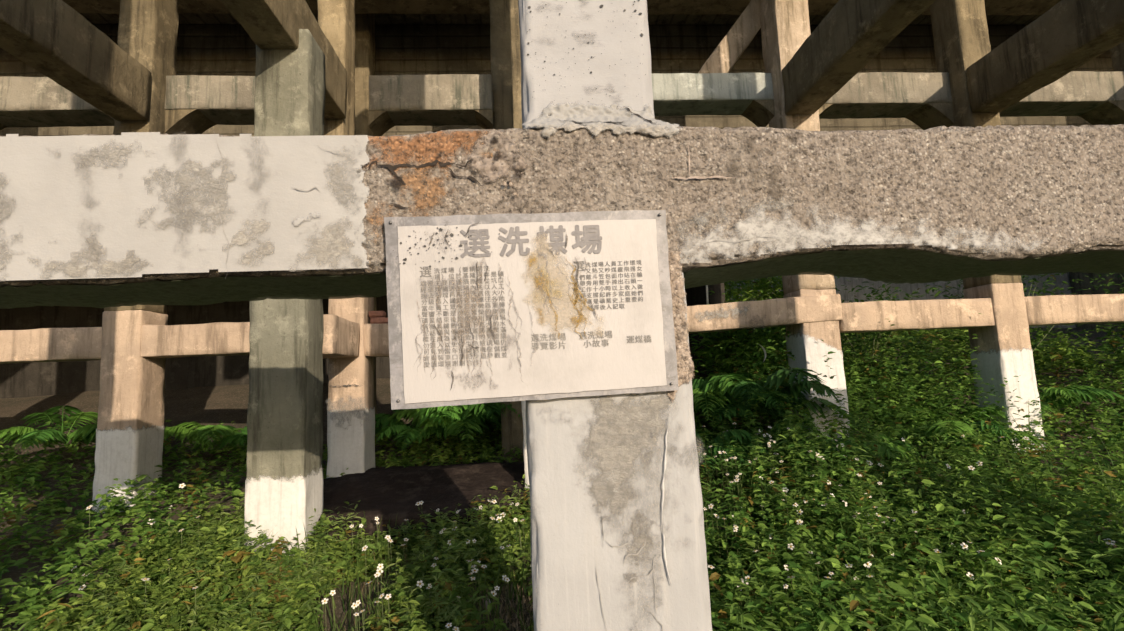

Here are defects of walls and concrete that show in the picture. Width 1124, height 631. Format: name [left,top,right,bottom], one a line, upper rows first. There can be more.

peeling [0,132,374,281]
spalling [386,177,403,189]
corrosion [367,131,493,215]
spalling [469,130,530,196]
peeling [580,201,1040,583]